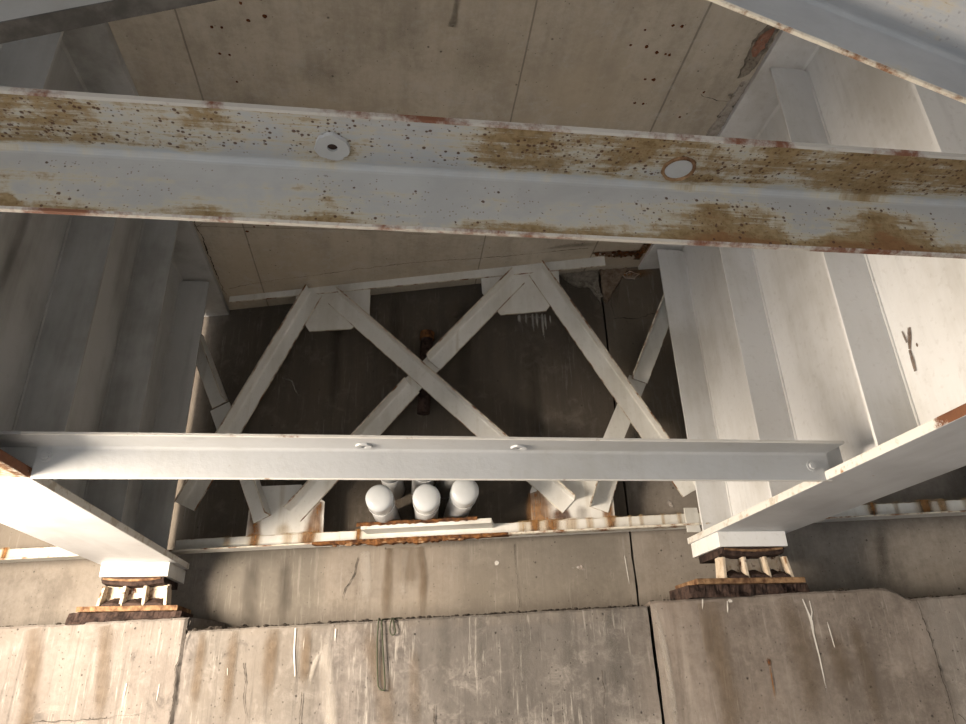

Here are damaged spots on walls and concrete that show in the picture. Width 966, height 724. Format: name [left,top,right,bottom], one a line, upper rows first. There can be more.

spalling [706,25,780,137]
rust [592,243,651,277]
rust [249,514,260,546]
rust [302,491,699,597]
rust [919,499,946,512]
crack [916,600,966,724]